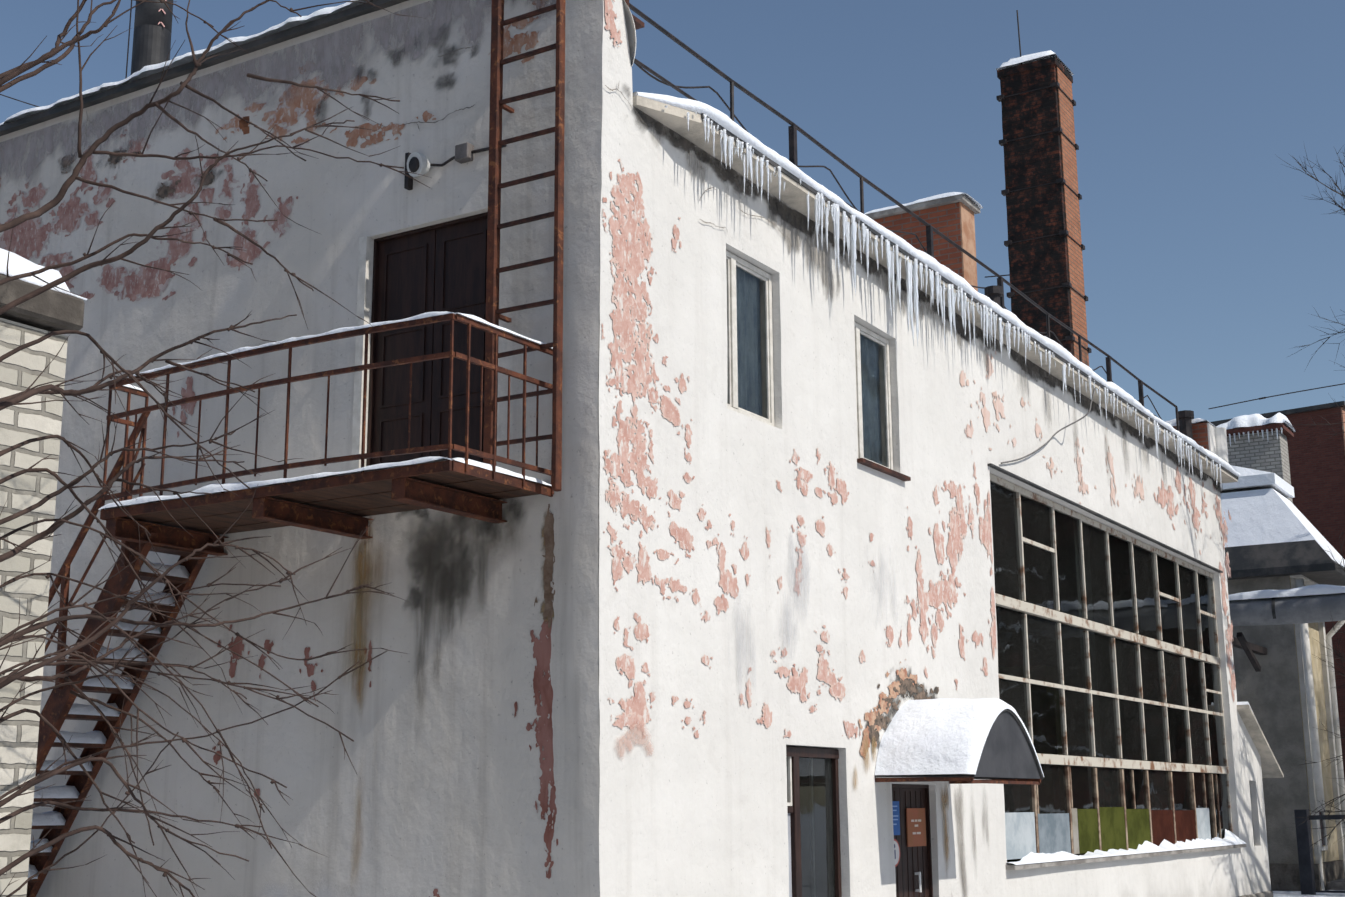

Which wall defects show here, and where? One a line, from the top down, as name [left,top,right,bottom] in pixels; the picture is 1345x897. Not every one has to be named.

peeling [0,66,436,302]
peeling [602,159,751,622]
peeling [960,350,1017,450]
peeling [217,624,274,683]
peeling [514,504,558,879]
peeling [608,613,656,756]
peeling [672,696,706,738]
peeling [740,667,792,738]
peeling [771,625,846,713]
peeling [776,448,850,599]
peeling [842,462,997,759]
peeling [1021,397,1236,702]